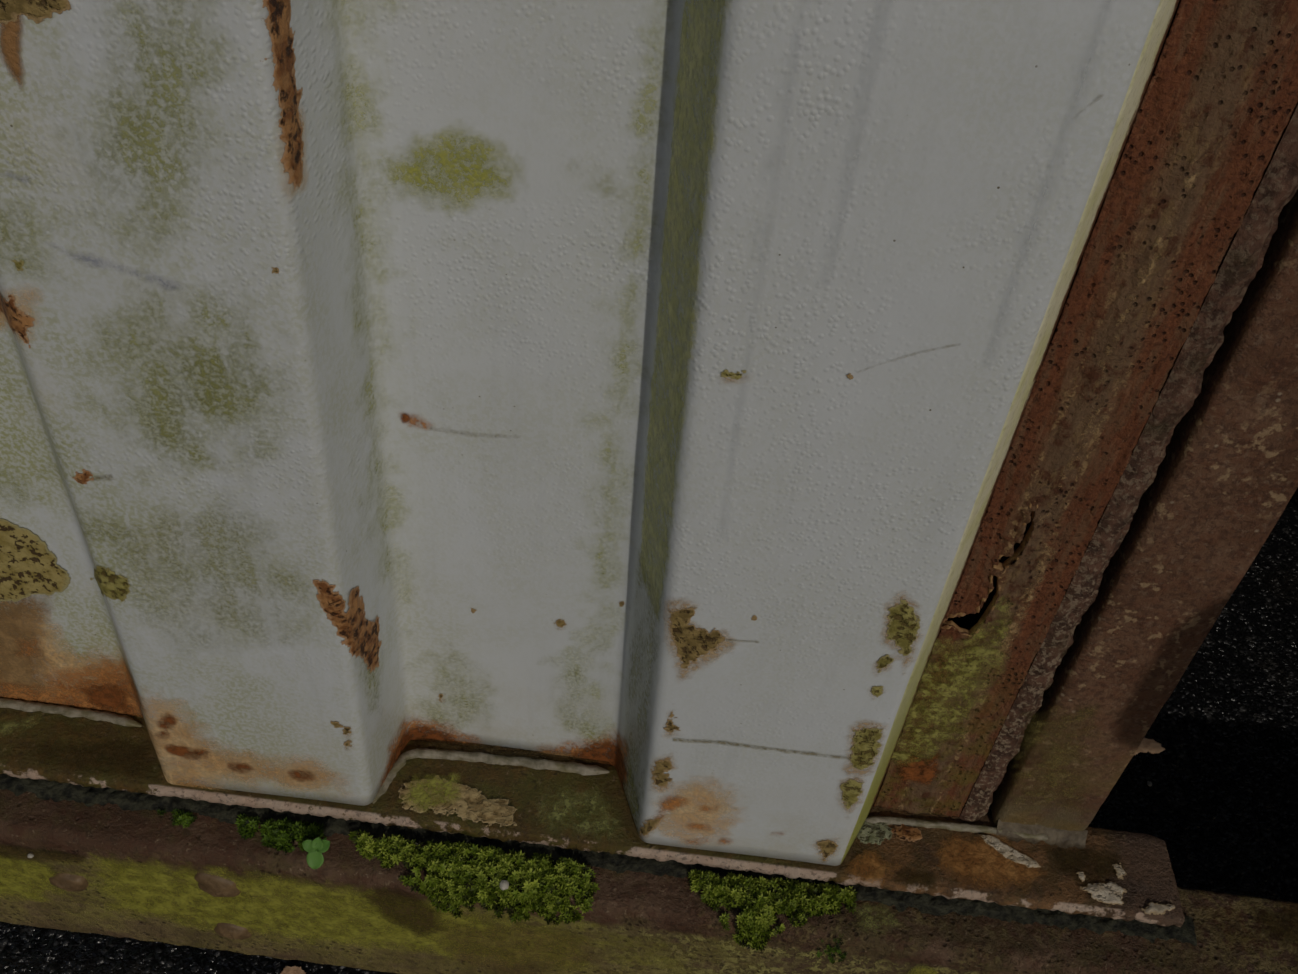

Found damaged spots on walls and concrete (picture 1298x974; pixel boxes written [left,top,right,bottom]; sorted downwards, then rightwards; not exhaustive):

corrosion [263,0,304,190]
corrosion [0,519,328,789]
crack [941,501,1050,649]